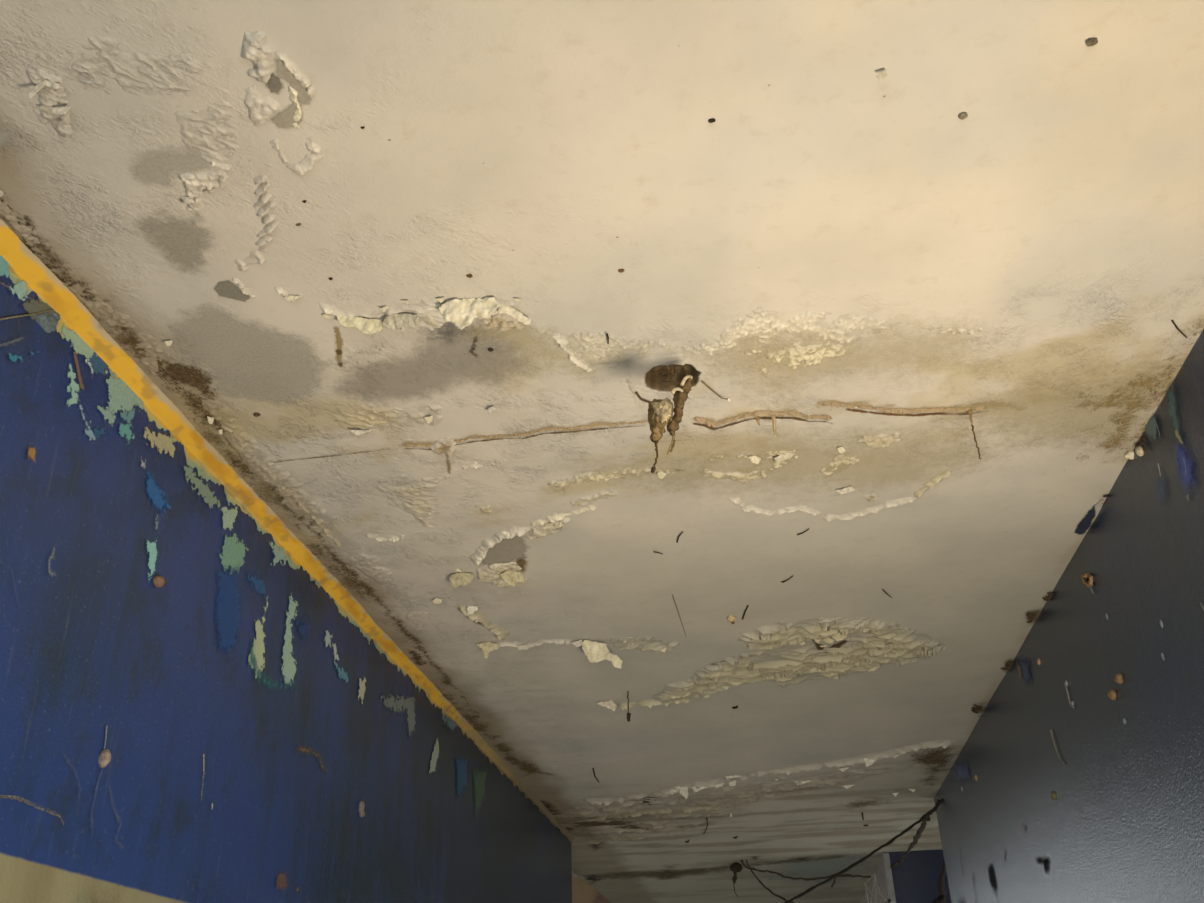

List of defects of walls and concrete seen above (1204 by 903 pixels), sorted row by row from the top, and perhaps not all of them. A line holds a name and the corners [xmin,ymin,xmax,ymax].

flaking render [0,190,172,376]
peeling [317,296,597,372]
water stain [1077,358,1181,452]
peeling [0,255,311,689]
flaking render [198,396,442,631]
rust [429,437,458,473]
peeling [449,505,597,589]
water stain [818,431,902,479]
peeling [324,630,366,704]
peeling [477,637,679,669]
peeling [596,617,948,711]
crack [0,795,64,826]